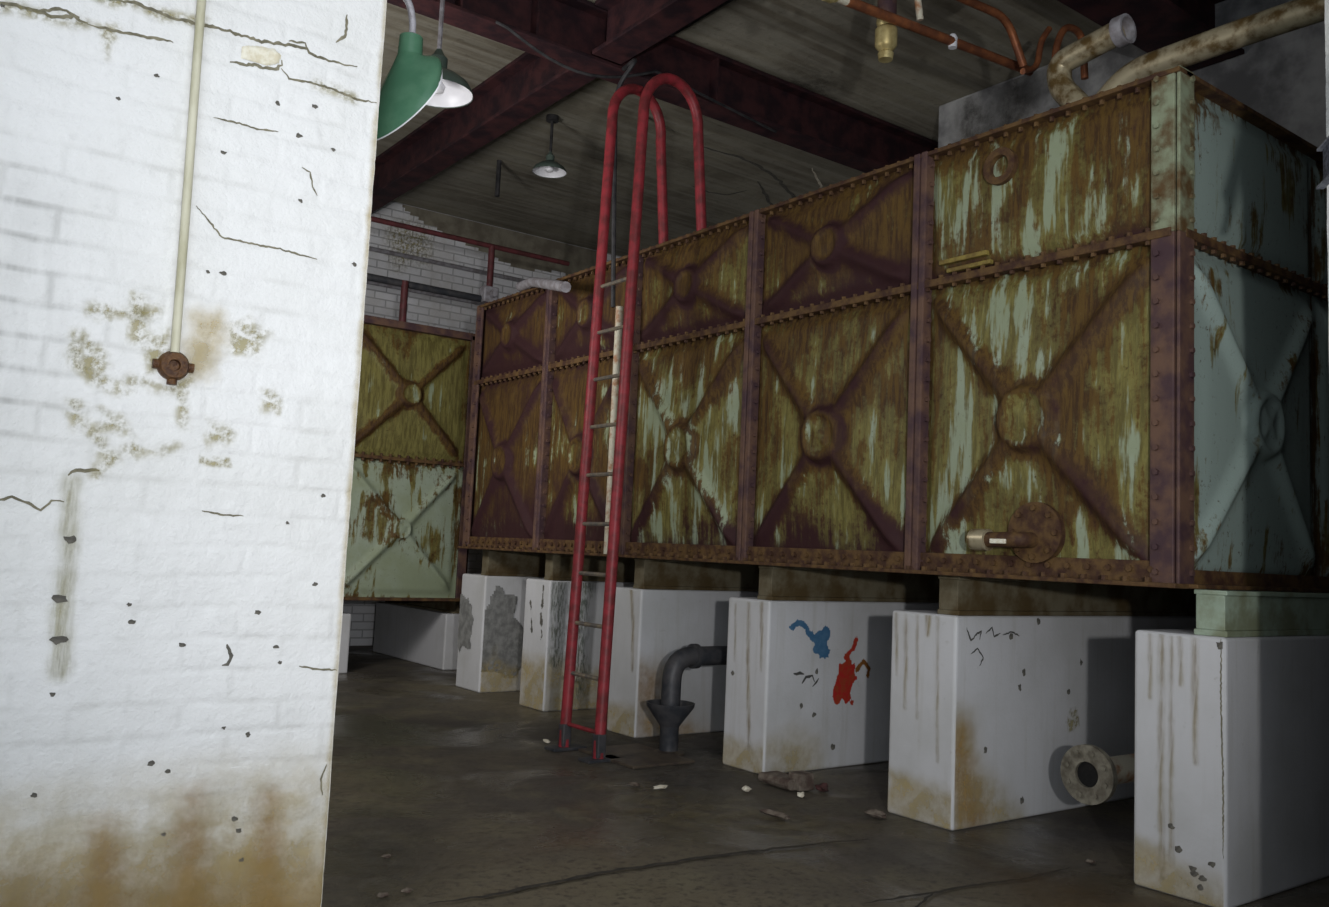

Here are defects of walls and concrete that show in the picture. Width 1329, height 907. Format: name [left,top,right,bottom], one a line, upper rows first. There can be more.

crack [0,0,377,103]
crack [196,206,317,260]
water stain [76,342,105,382]
water stain [90,306,156,339]
water stain [178,321,219,388]
water stain [233,325,261,353]
crack [0,468,100,511]
water stain [49,583,69,645]
spalling [457,583,563,678]
crack [429,838,868,904]